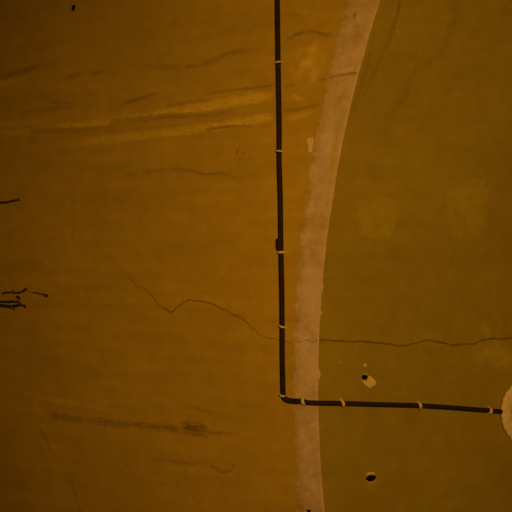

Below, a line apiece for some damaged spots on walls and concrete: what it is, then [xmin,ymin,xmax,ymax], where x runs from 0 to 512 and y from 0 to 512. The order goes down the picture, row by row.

crack [0,288,49,311]
crack [92,243,512,347]
spalling [361,373,377,388]